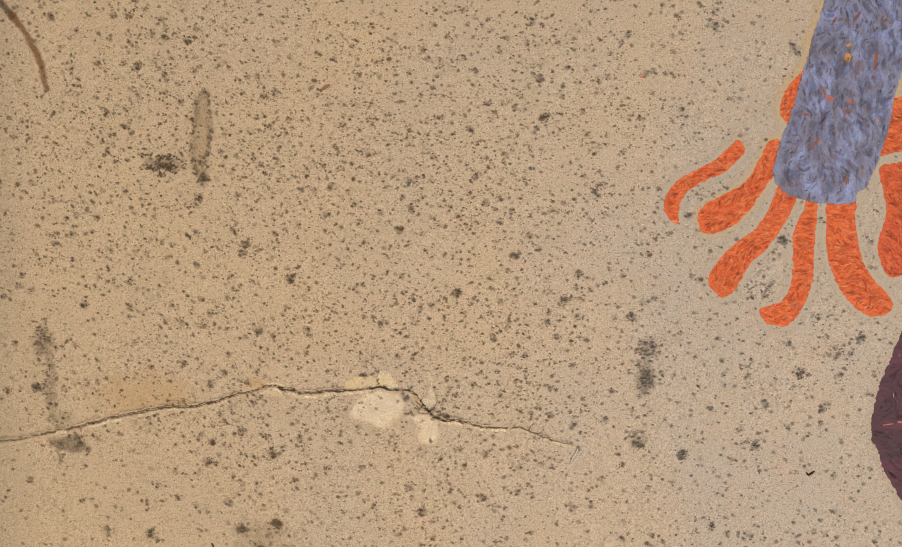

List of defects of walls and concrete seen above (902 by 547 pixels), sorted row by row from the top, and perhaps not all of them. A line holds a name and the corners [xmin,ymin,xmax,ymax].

damp [0,0,629,471]
crack [51,371,570,447]
spalling [350,390,439,445]